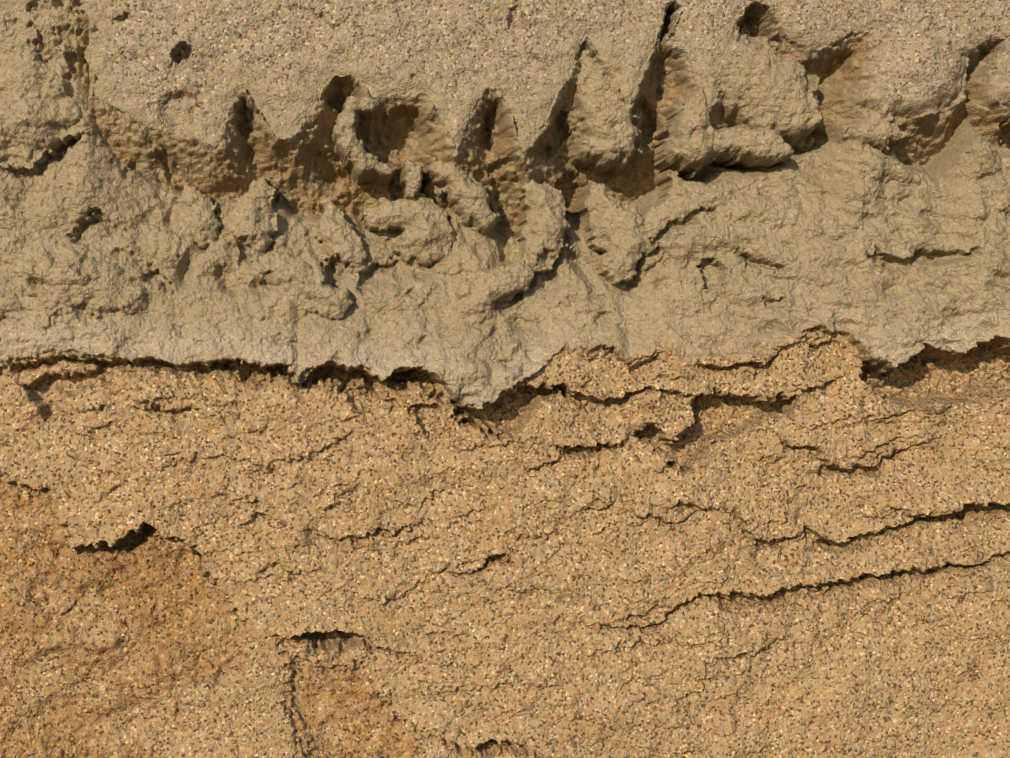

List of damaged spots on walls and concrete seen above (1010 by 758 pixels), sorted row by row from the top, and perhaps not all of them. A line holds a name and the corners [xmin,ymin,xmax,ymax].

spalling [0,0,1010,486]
spalling [0,472,556,758]
peeling [564,458,1010,712]